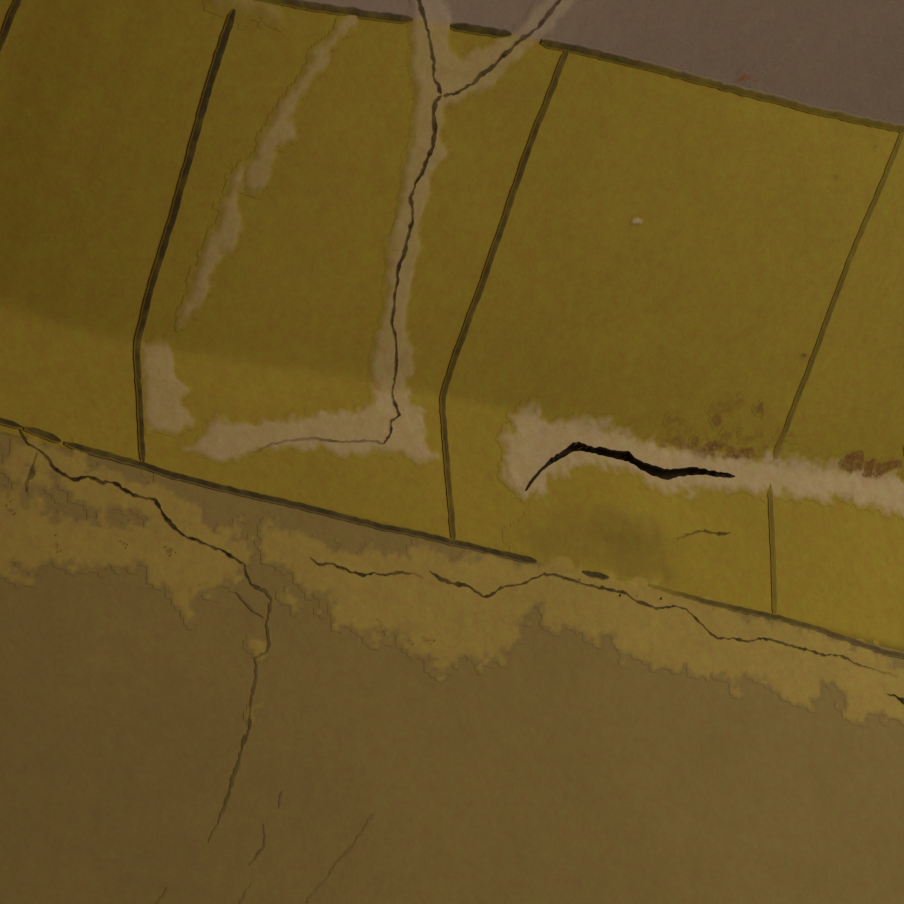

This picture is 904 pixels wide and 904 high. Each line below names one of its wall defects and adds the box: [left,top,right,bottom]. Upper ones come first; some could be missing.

damp [174,0,582,468]
crack [253,0,561,452]
damp [502,492,684,599]
crack [525,441,735,491]
damp [618,432,904,521]
crack [19,429,273,842]
crack [311,558,904,705]